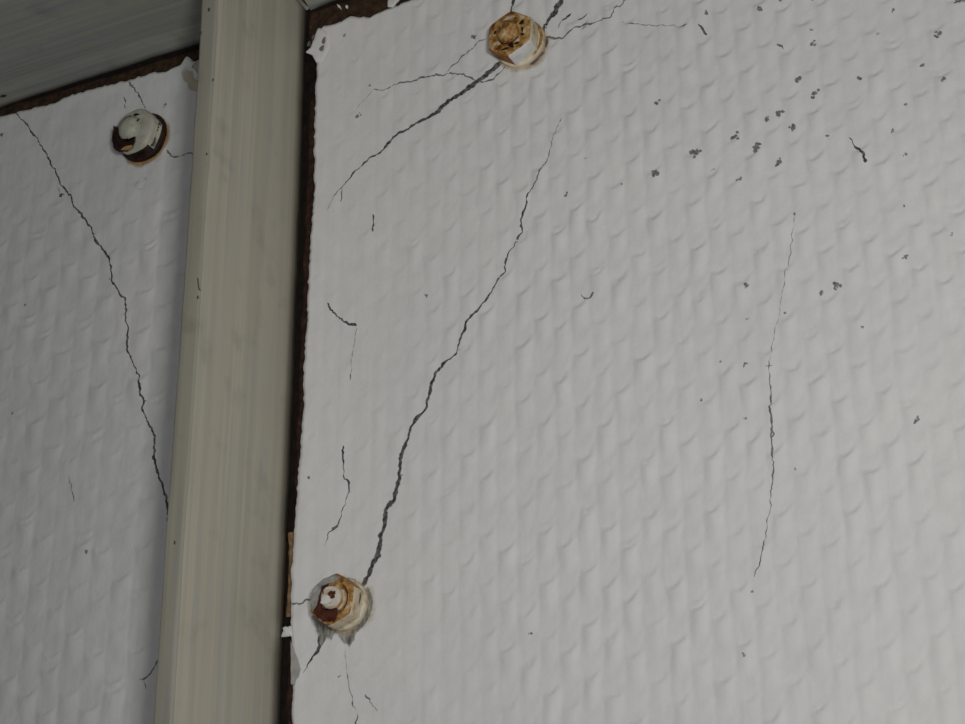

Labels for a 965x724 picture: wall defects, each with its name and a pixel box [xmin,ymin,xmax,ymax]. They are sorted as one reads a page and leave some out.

rust [494,20,548,70]
crack [542,0,707,40]
rust [112,113,169,166]
crack [327,38,505,210]
crack [16,113,168,515]
crack [327,303,357,379]
crack [362,120,561,586]
crack [754,233,793,577]
crack [326,446,350,541]
rust [313,585,372,632]
crack [303,636,321,673]
crack [345,656,377,724]